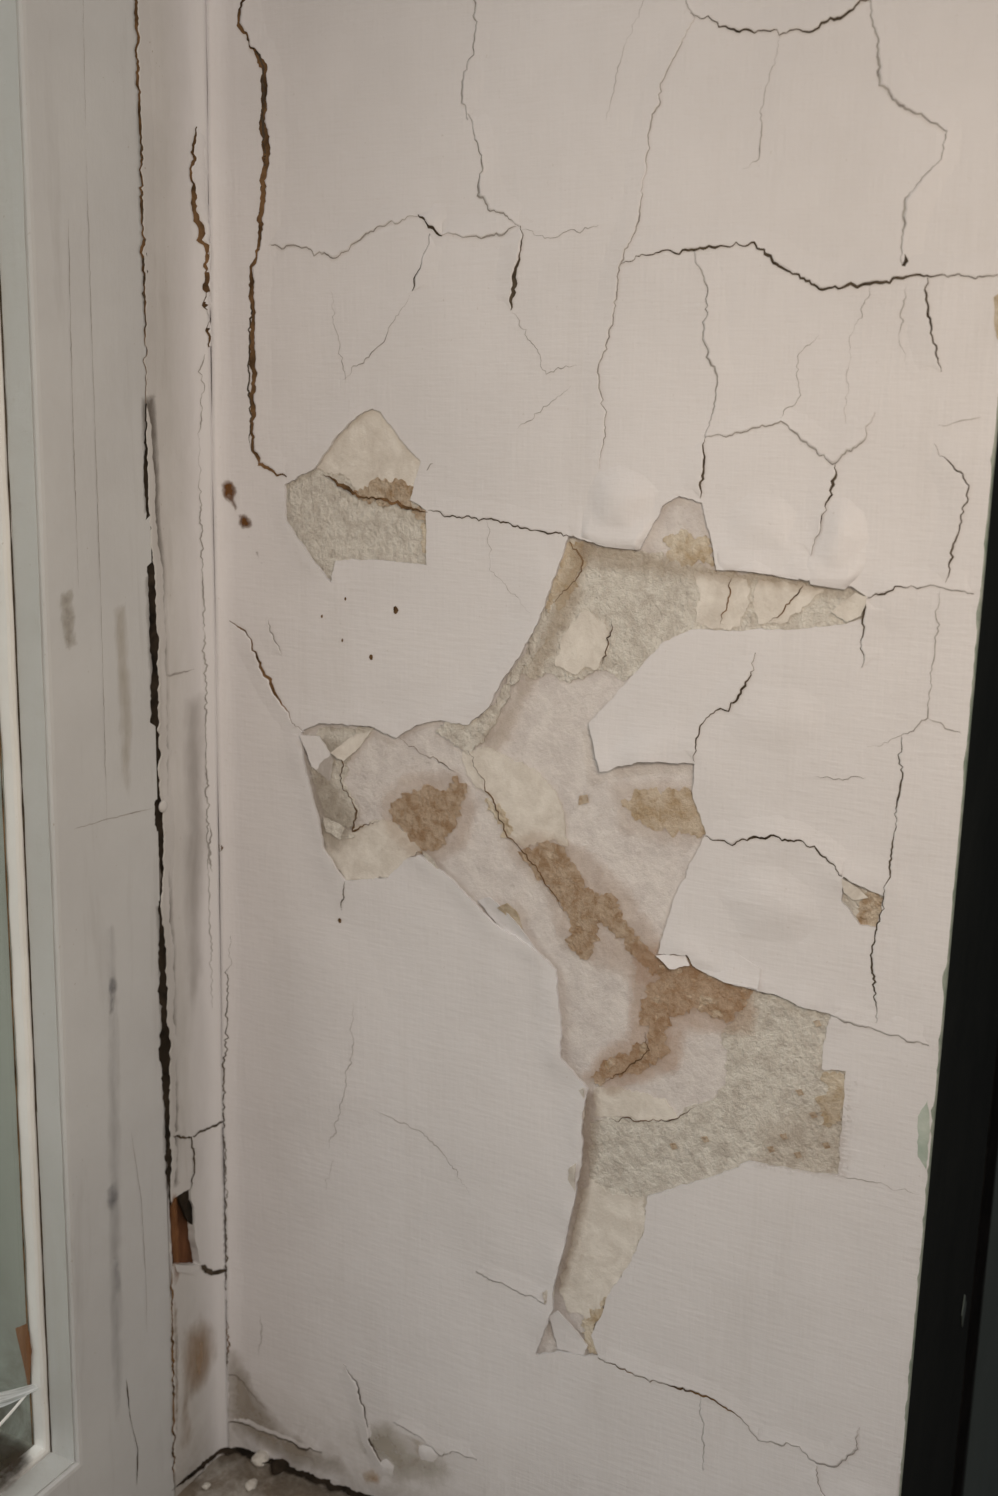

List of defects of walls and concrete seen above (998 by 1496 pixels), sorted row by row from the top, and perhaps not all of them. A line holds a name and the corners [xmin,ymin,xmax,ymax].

crack [237,0,998,555]
peeling [286,409,427,580]
crack [427,463,574,606]
crack [68,0,322,1480]
crack [678,652,756,761]
crack [819,417,980,1046]
peeling [299,496,867,1355]
crack [706,815,849,877]
peeling [842,877,883,926]
spalling [169,1190,201,1274]
peeling [951,1037,998,1496]
crack [598,1347,859,1496]